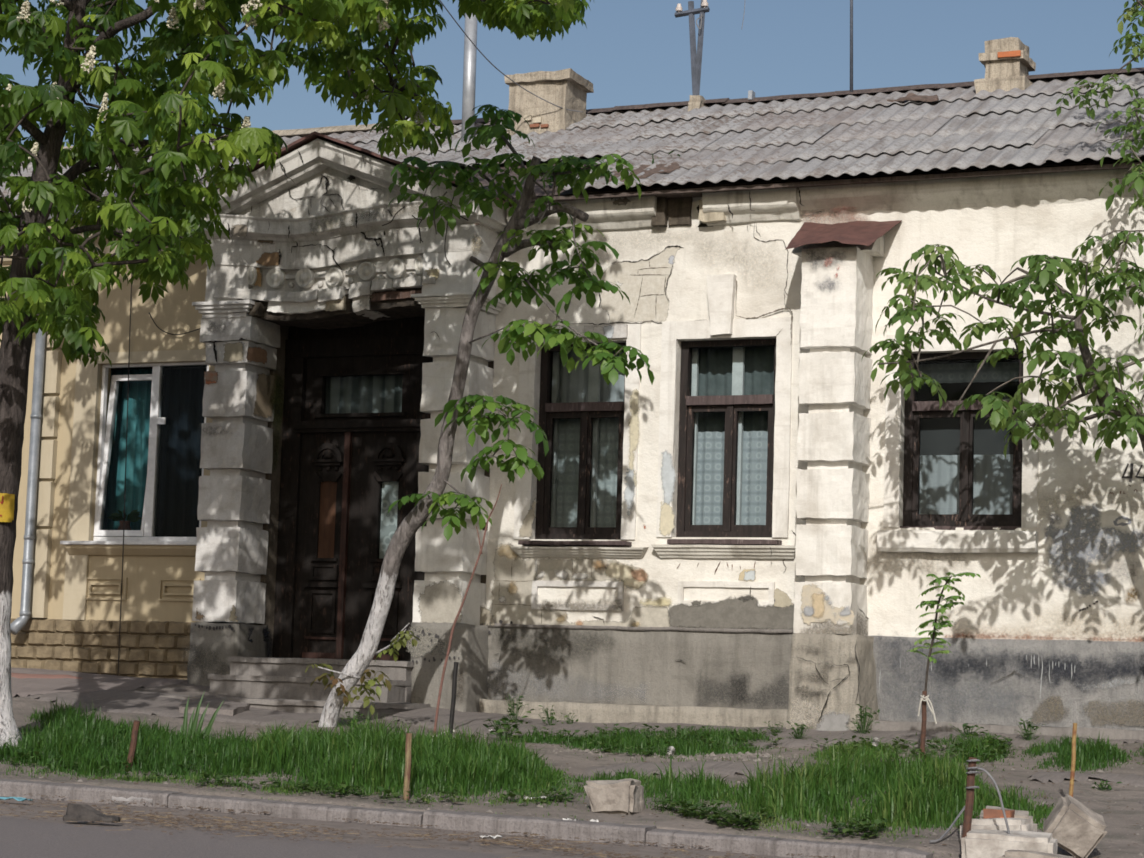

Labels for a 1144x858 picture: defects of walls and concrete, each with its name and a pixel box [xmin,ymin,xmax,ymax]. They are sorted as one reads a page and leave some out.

crack [228,151,385,272]
flaking render [230,224,280,287]
crack [728,192,793,346]
peeling [624,390,640,515]
peeling [659,451,676,536]
flaking render [407,580,463,656]
flaking render [480,501,671,627]
flaking render [738,569,756,581]
flaking render [774,583,856,626]
crack [796,607,869,722]
leakage [1026,655,1075,694]